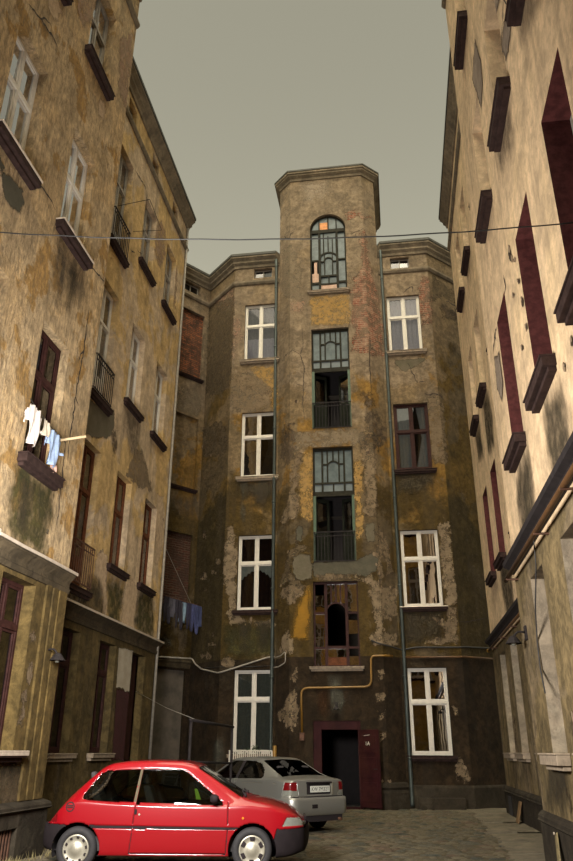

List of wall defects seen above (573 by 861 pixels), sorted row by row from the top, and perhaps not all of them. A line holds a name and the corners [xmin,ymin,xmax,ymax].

flaking render [349,229,385,357]
flaking render [417,275,456,325]
crack [56,307,90,525]
flaking render [200,526,276,628]
flaking render [279,541,310,605]
flaking render [316,442,399,646]
flaking render [424,521,459,645]
flaking render [279,629,294,655]
flaking render [277,667,300,732]
flaking render [455,757,471,784]